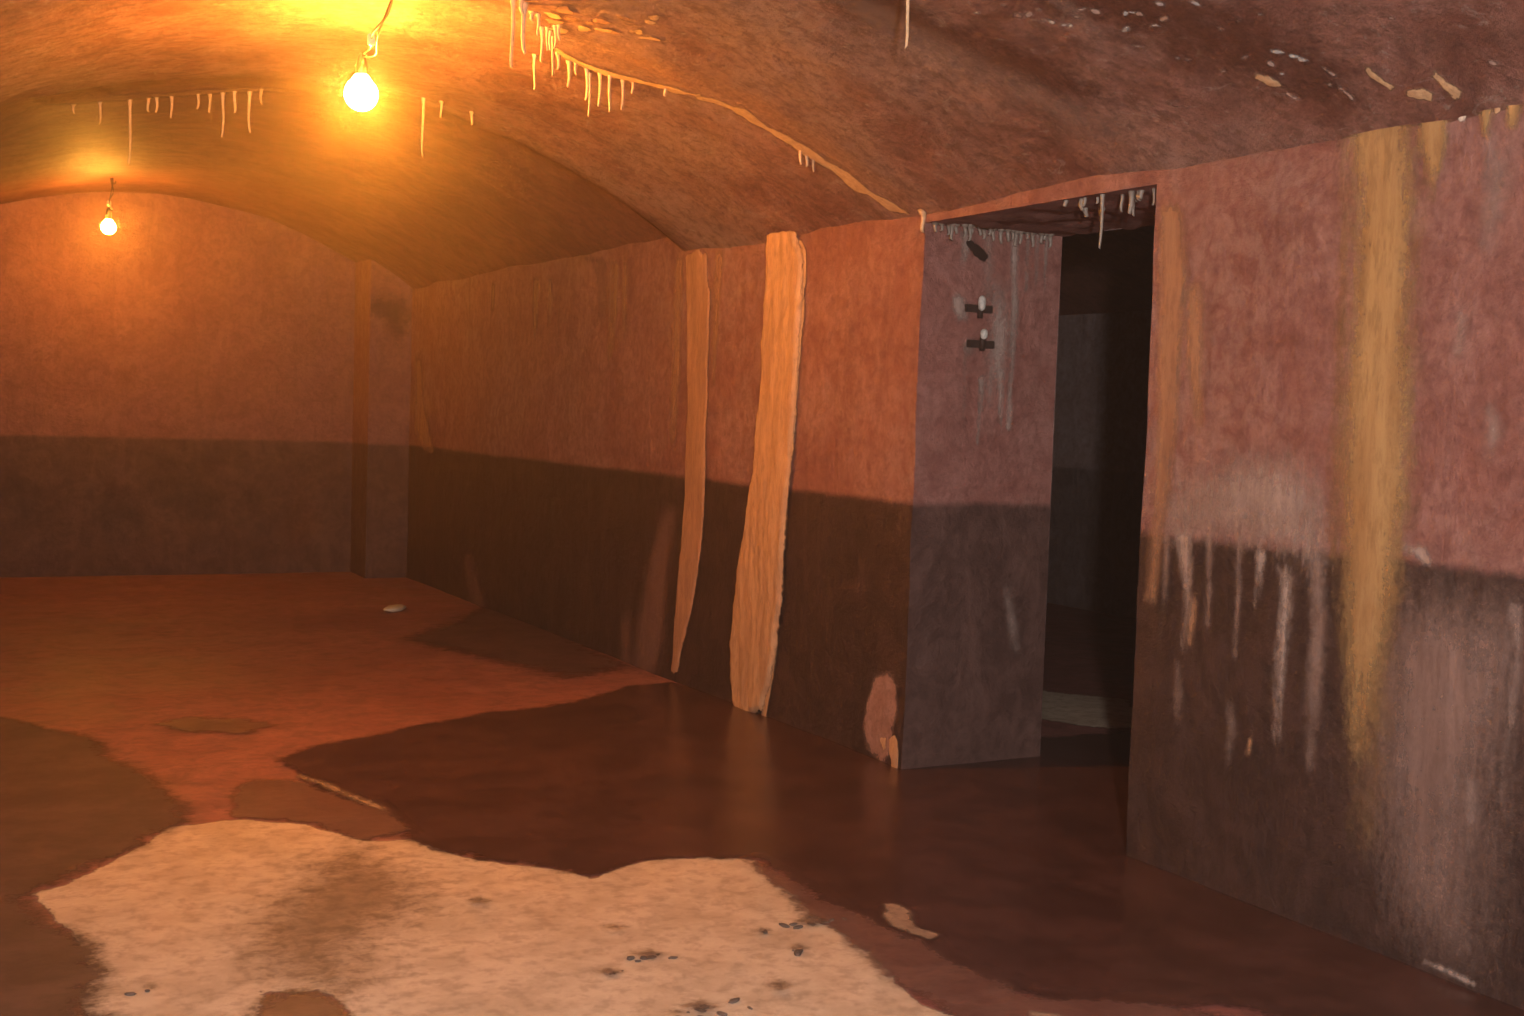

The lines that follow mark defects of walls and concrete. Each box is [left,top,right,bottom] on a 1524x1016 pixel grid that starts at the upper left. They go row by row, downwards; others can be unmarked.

efflorescence [43,87,304,165]
efflorescence [503,0,1054,431]
damp [229,97,1524,1016]